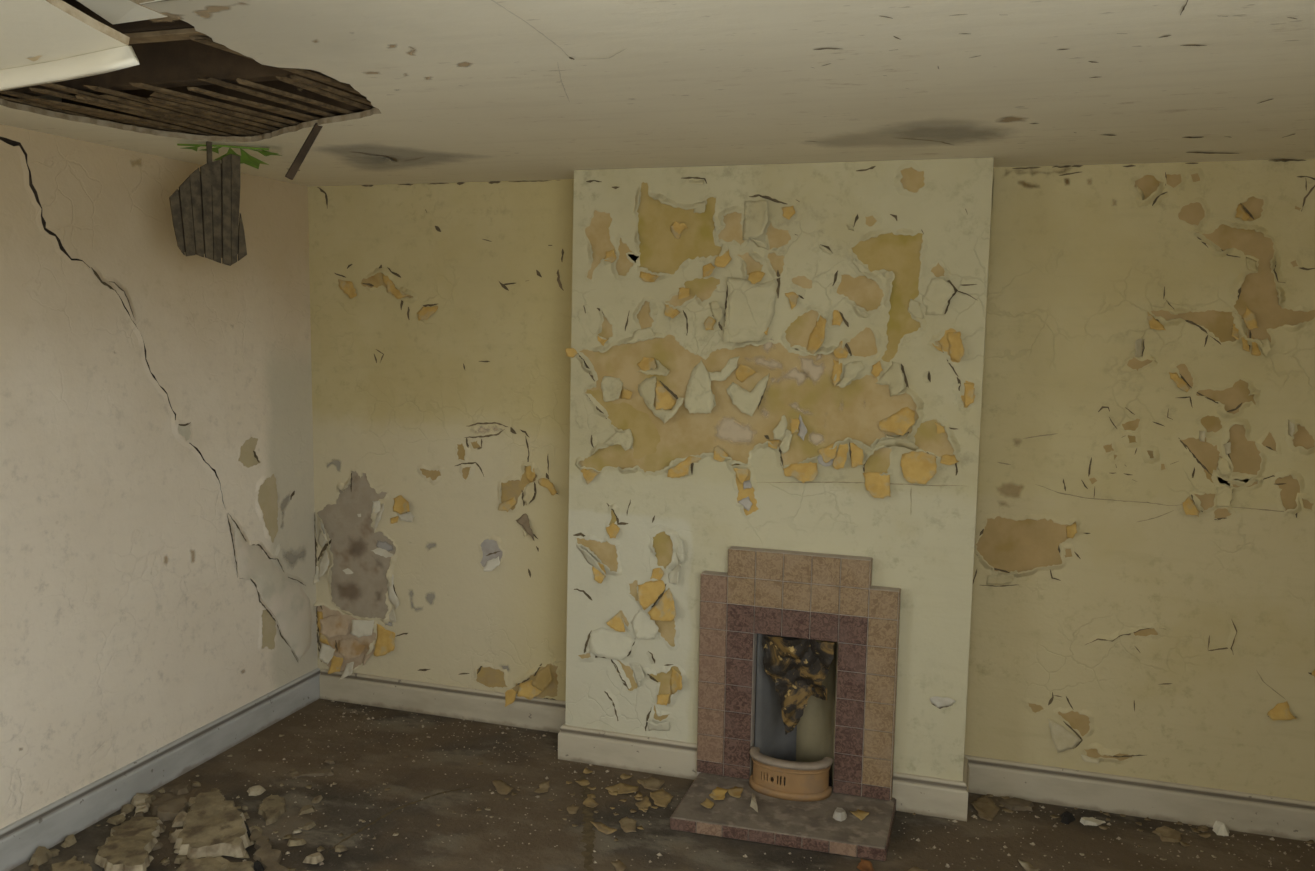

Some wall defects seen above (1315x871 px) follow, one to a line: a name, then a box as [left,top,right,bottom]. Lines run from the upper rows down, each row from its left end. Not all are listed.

peeling [894,161,929,197]
crack [0,137,307,662]
peeling [335,264,438,321]
peeling [565,177,983,519]
peeling [1085,137,1315,523]
flaking render [313,467,414,680]
peeling [417,422,559,551]
peeling [477,535,505,572]
peeling [573,500,687,732]
peeling [973,502,1090,587]
peeling [458,660,561,707]